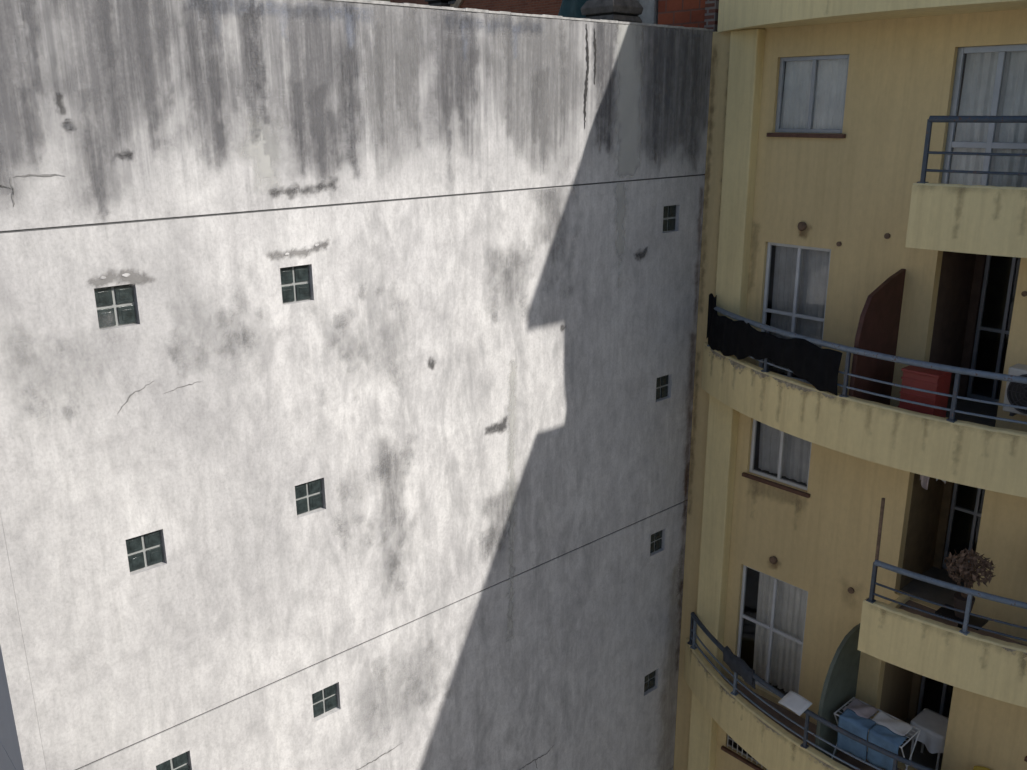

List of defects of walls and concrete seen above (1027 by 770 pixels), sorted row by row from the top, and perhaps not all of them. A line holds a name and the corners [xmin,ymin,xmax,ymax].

damp [0,0,39,169]
damp [56,93,74,130]
damp [67,0,166,198]
damp [187,0,235,150]
damp [271,2,358,197]
damp [436,10,478,115]
damp [493,14,571,159]
damp [596,22,706,255]
spalling [90,270,149,286]
crack [118,381,198,413]